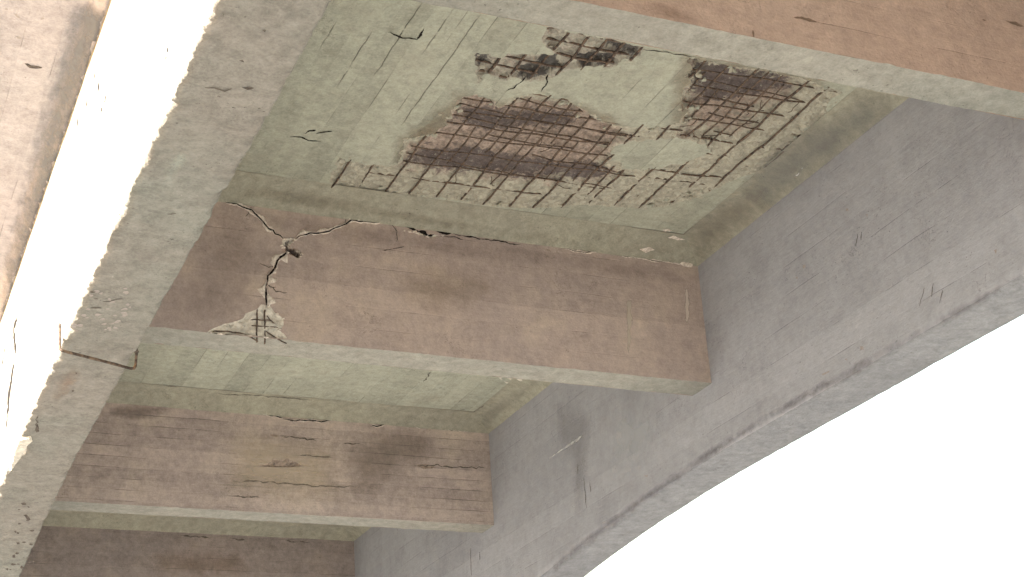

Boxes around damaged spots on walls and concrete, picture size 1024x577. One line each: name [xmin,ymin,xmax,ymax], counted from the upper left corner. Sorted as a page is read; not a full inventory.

spalling [329,27,843,212]
crack [226,201,520,308]
spalling [208,304,287,344]
crack [219,393,384,458]
crack [233,480,354,498]
crack [415,462,484,470]